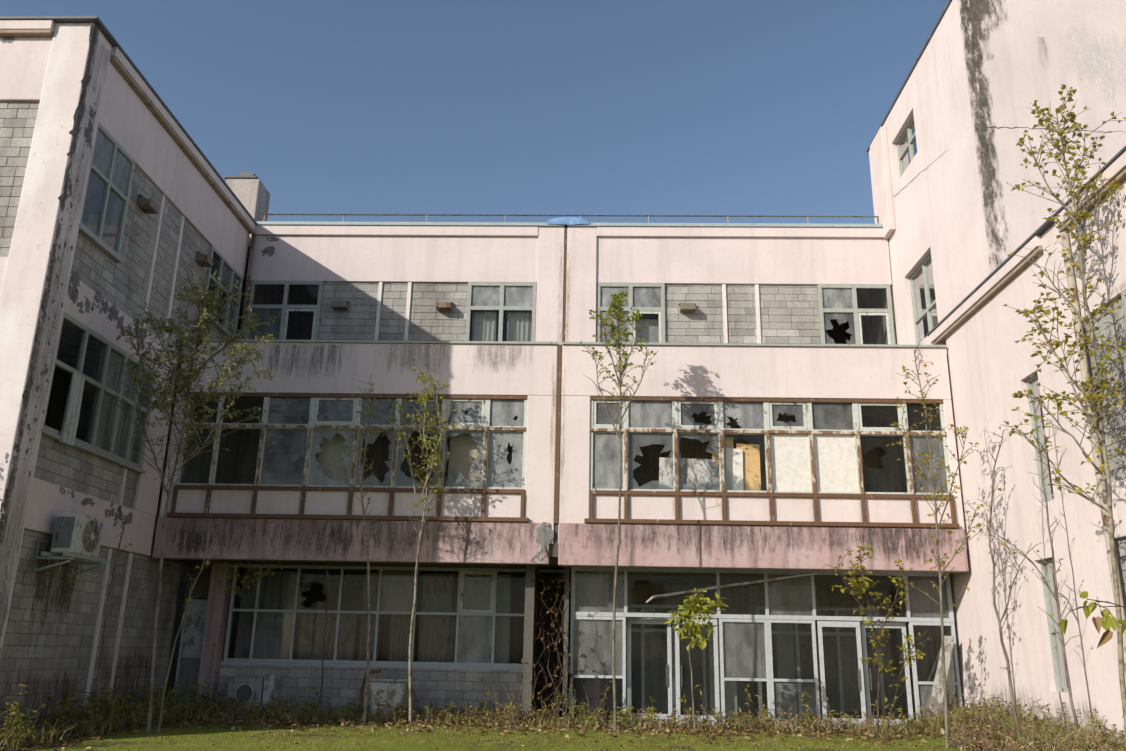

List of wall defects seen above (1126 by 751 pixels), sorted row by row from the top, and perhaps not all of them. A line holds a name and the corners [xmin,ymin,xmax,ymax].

spalling [0,23,150,537]
leakage [960,0,1005,264]